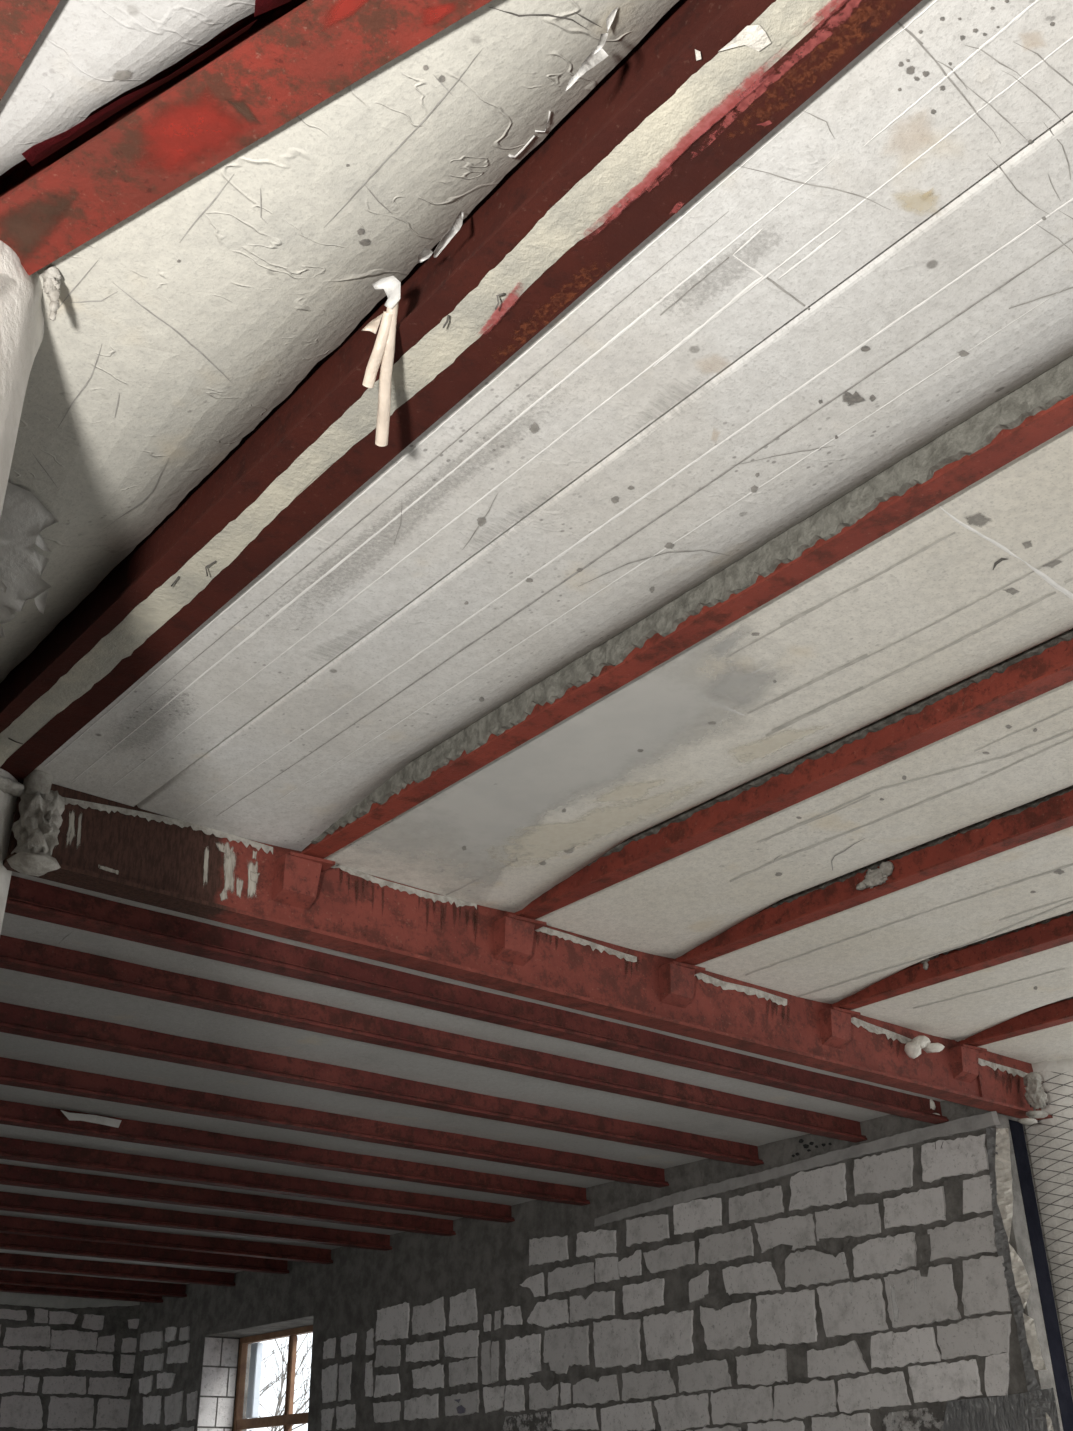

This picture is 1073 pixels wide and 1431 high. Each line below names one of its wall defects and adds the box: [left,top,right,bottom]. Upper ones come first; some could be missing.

crack [490,7,602,30]
peeling [691,0,862,159]
leakage [354,632,747,884]